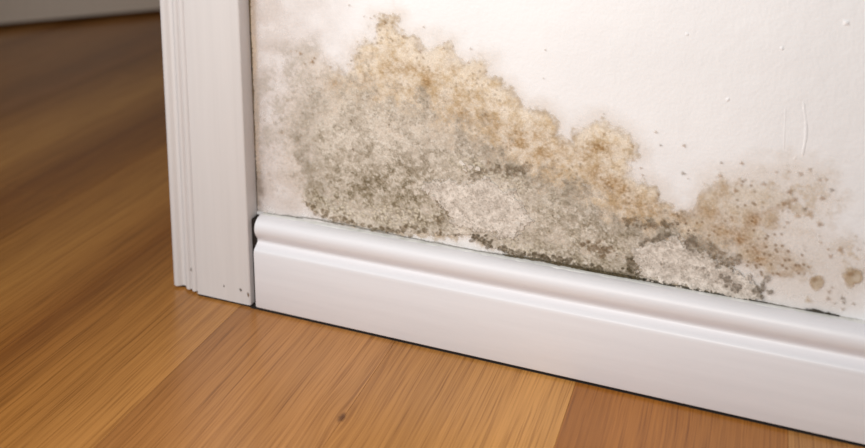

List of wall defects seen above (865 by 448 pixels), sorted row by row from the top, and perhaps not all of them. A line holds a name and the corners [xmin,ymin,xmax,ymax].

water stain [250,0,827,299]
water stain [841,250,862,286]